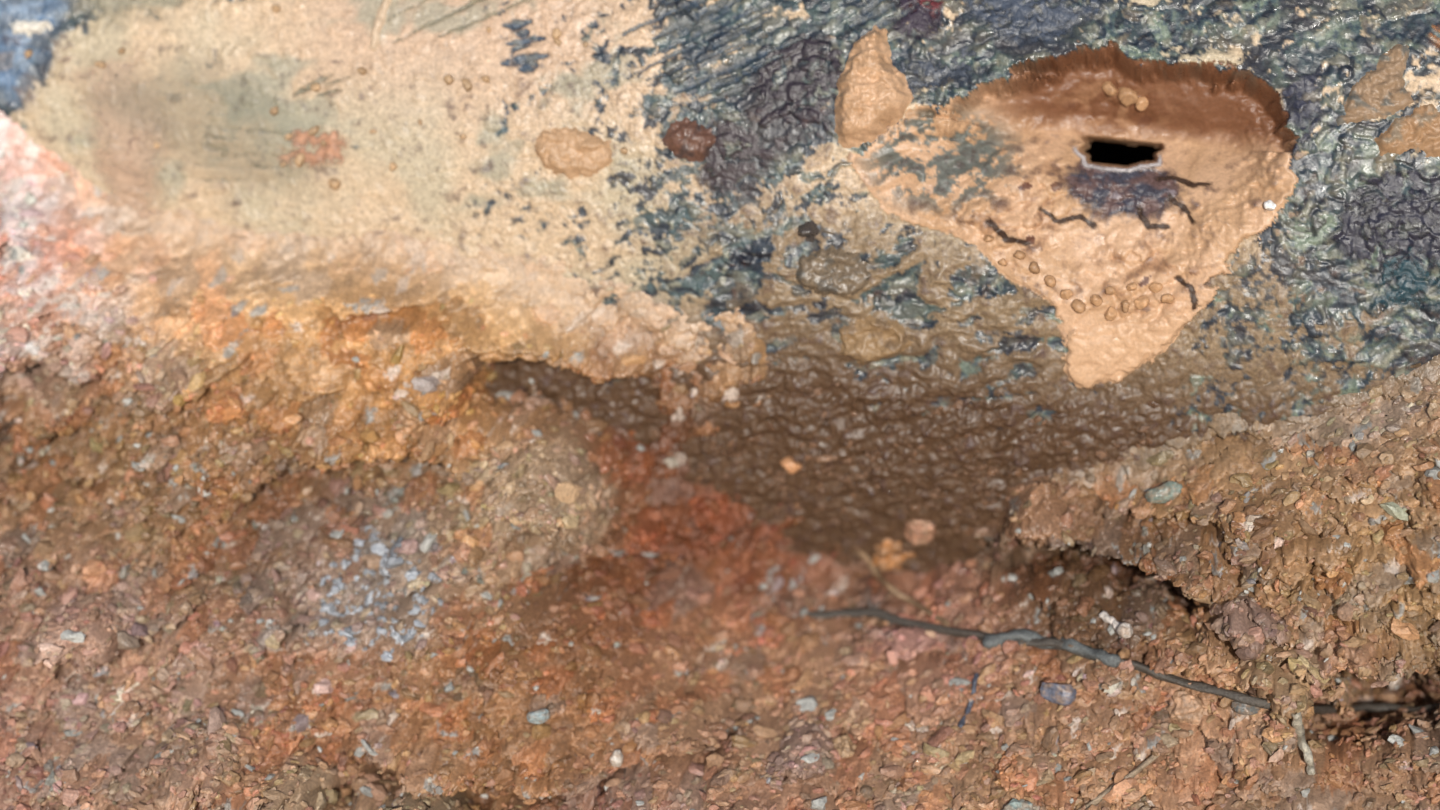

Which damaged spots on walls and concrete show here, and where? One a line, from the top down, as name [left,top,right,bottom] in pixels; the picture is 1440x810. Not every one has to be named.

spalling [847,0,1324,389]
peeling [1332,169,1440,309]